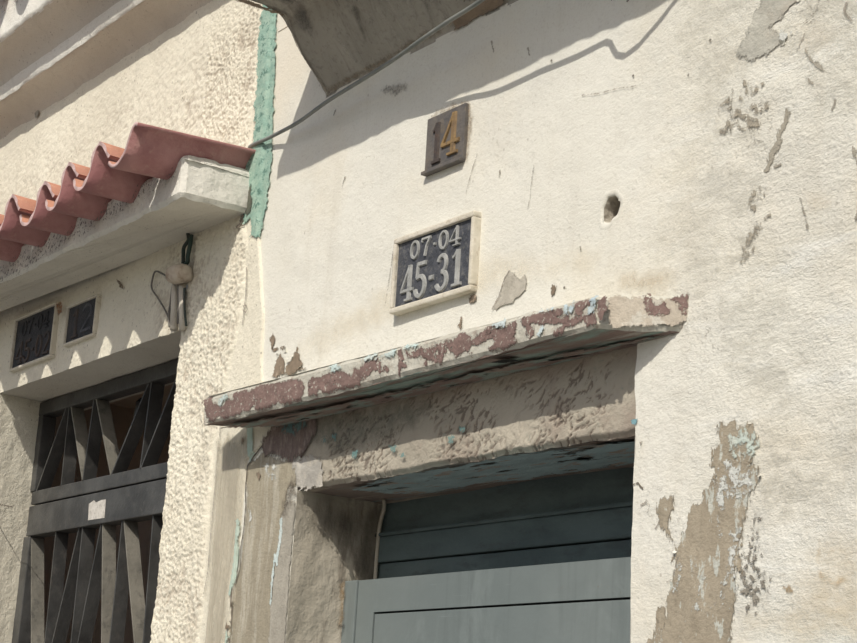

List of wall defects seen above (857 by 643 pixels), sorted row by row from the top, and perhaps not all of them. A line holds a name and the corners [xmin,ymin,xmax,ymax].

peeling [453,0,503,31]
peeling [736,0,800,62]
flaking render [717,79,769,136]
spalling [763,108,791,172]
flaking render [740,186,771,263]
flaking render [492,271,527,310]
peeling [202,293,689,643]
peeling [647,420,772,643]